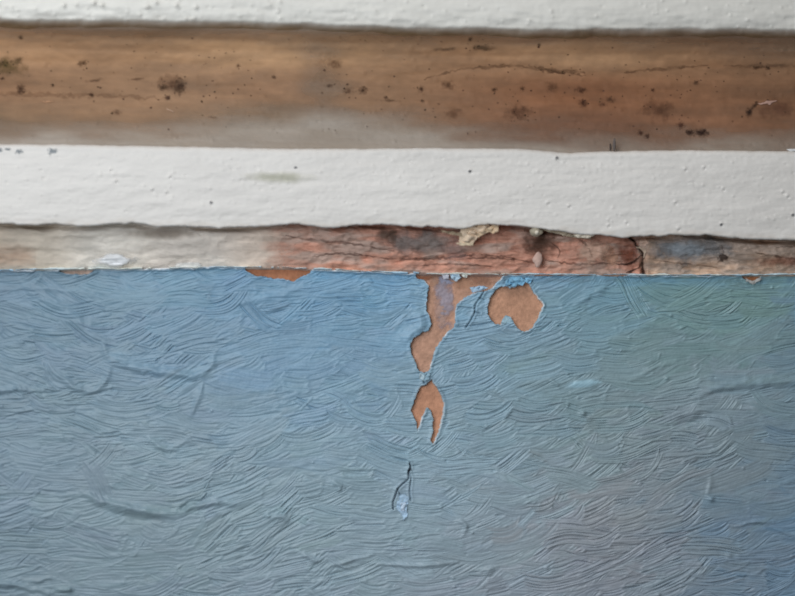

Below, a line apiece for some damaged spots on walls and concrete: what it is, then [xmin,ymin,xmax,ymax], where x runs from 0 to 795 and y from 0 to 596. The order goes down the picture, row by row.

damp [0,35,795,141]
peeling [246,224,795,443]
crack [393,462,411,520]